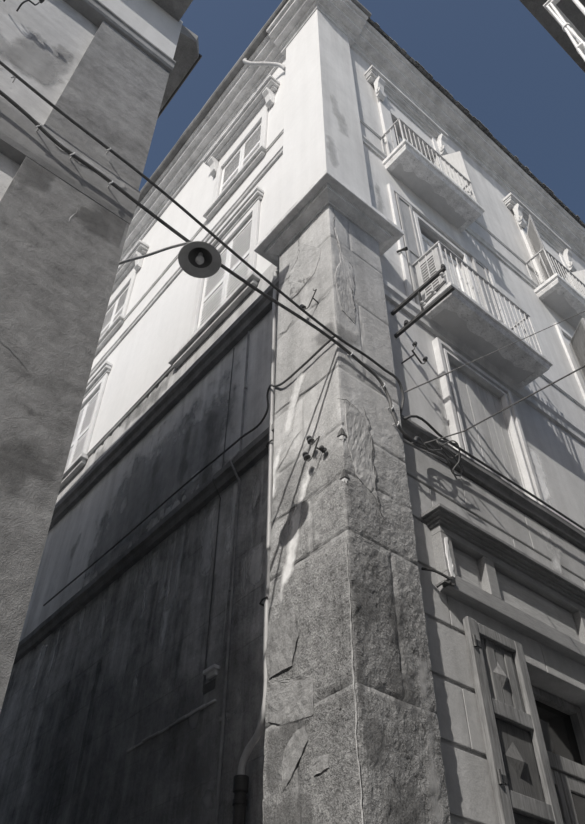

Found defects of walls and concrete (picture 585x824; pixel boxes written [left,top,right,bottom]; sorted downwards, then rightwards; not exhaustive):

damp [0,33,71,84]
damp [273,374,304,497]
damp [280,471,315,595]